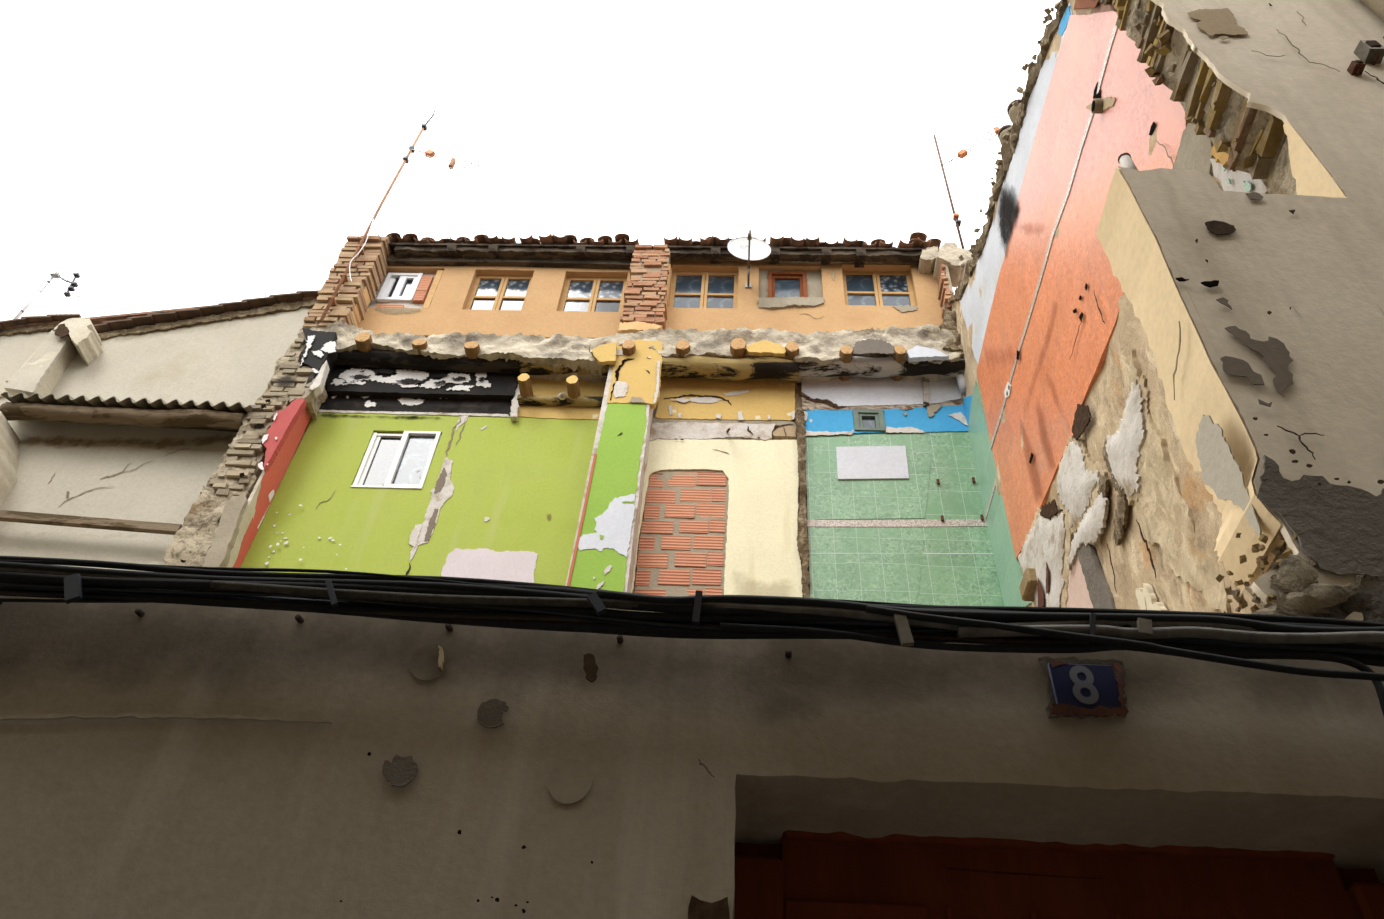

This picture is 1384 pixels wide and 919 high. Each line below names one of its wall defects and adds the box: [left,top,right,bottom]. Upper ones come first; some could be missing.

peeling [1187,8,1248,40]
flaking render [1210,145,1268,200]
spalling [1195,220,1236,243]
flaking render [853,339,895,354]
peeling [1176,277,1293,436]
peeling [613,357,749,420]
peeling [409,457,454,563]
peeling [578,494,635,589]
flaking render [1018,379,1147,607]
flaking render [1195,415,1384,623]
flaking render [1135,583,1168,611]